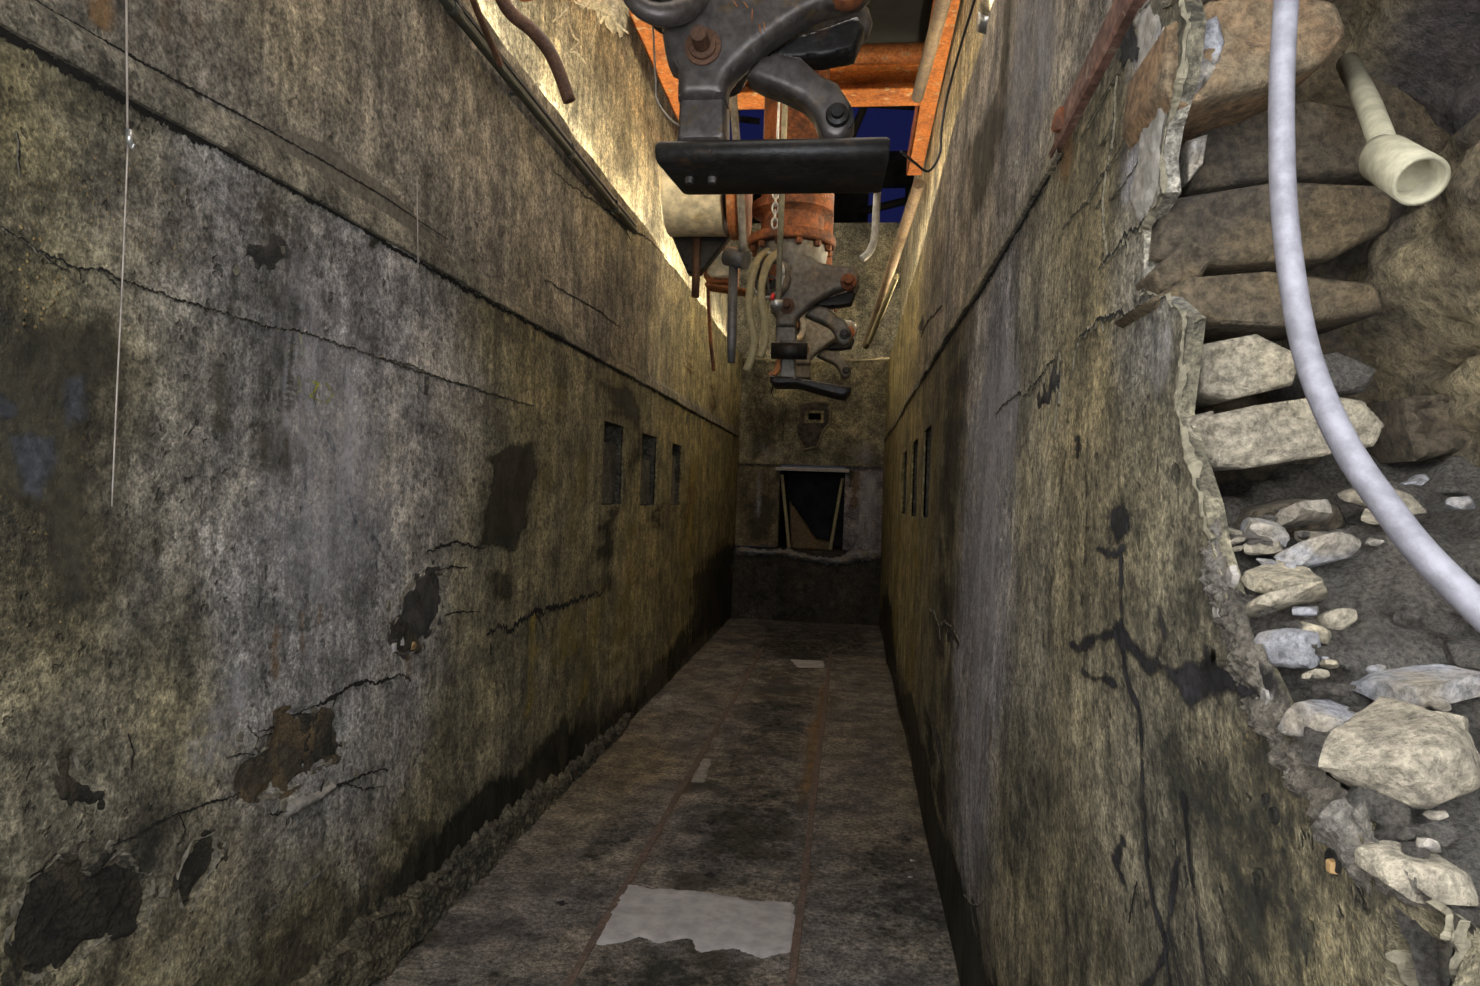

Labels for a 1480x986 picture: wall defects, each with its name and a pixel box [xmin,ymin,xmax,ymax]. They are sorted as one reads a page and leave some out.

spalling [1119,25,1140,70]
crack [0,0,736,437]
crack [921,65,1166,380]
spalling [1037,364,1061,409]
crack [995,304,1140,433]
crack [427,539,485,570]
spalling [385,560,450,660]
crack [445,589,604,655]
spalling [232,704,359,813]
spalling [4,829,229,982]
crack [1128,881,1137,924]